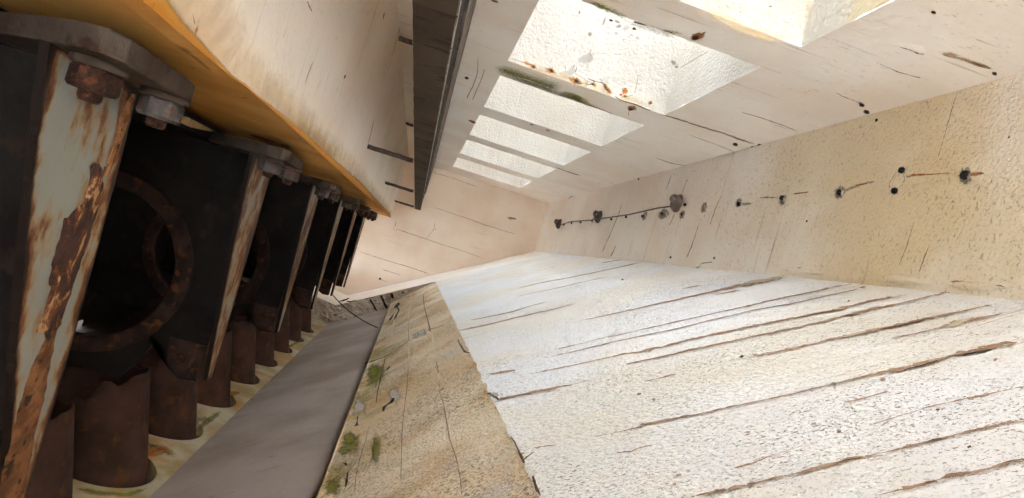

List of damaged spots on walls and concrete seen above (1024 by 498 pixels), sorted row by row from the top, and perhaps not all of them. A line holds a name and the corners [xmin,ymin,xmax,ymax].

corrosion [104,94,136,177]